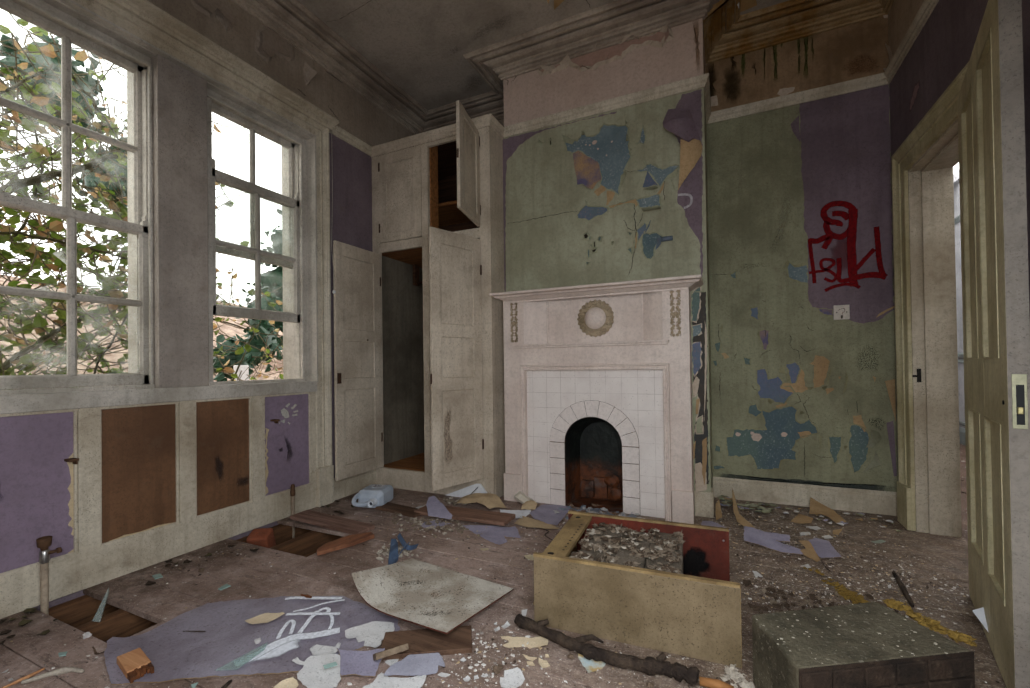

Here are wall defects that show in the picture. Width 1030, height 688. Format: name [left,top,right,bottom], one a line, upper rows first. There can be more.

water stain [709,43,782,99]
peeling [703,0,894,65]
peeling [562,119,680,265]
peeling [690,287,711,492]
peeling [725,355,882,473]